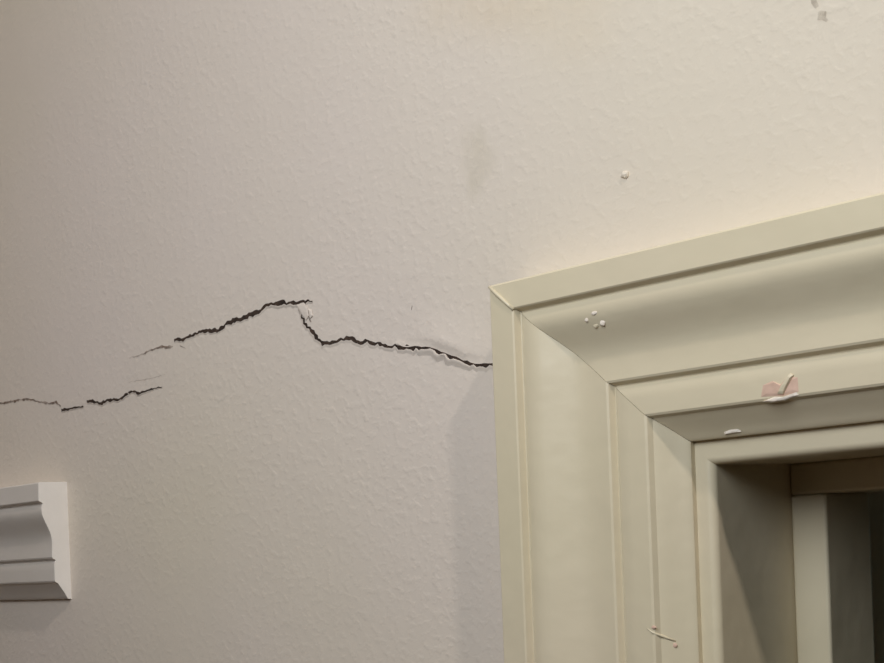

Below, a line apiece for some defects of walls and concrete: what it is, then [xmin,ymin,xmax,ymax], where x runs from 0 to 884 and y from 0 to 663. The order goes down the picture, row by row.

crack [144,298,493,372]
crack [0,387,162,413]